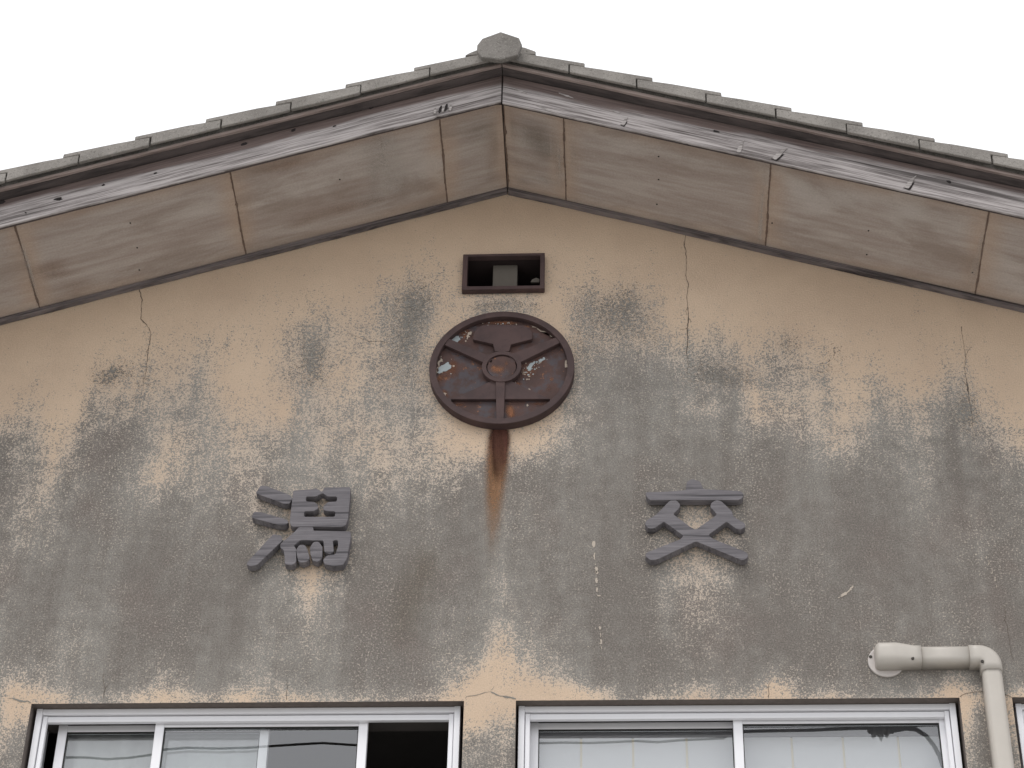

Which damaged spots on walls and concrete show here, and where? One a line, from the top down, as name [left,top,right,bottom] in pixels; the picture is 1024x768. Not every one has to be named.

water stain [92,361,152,389]
crack [139,289,151,391]
water stain [382,279,438,409]
water stain [570,282,661,375]
crack [682,235,691,370]
rust [487,430,509,520]